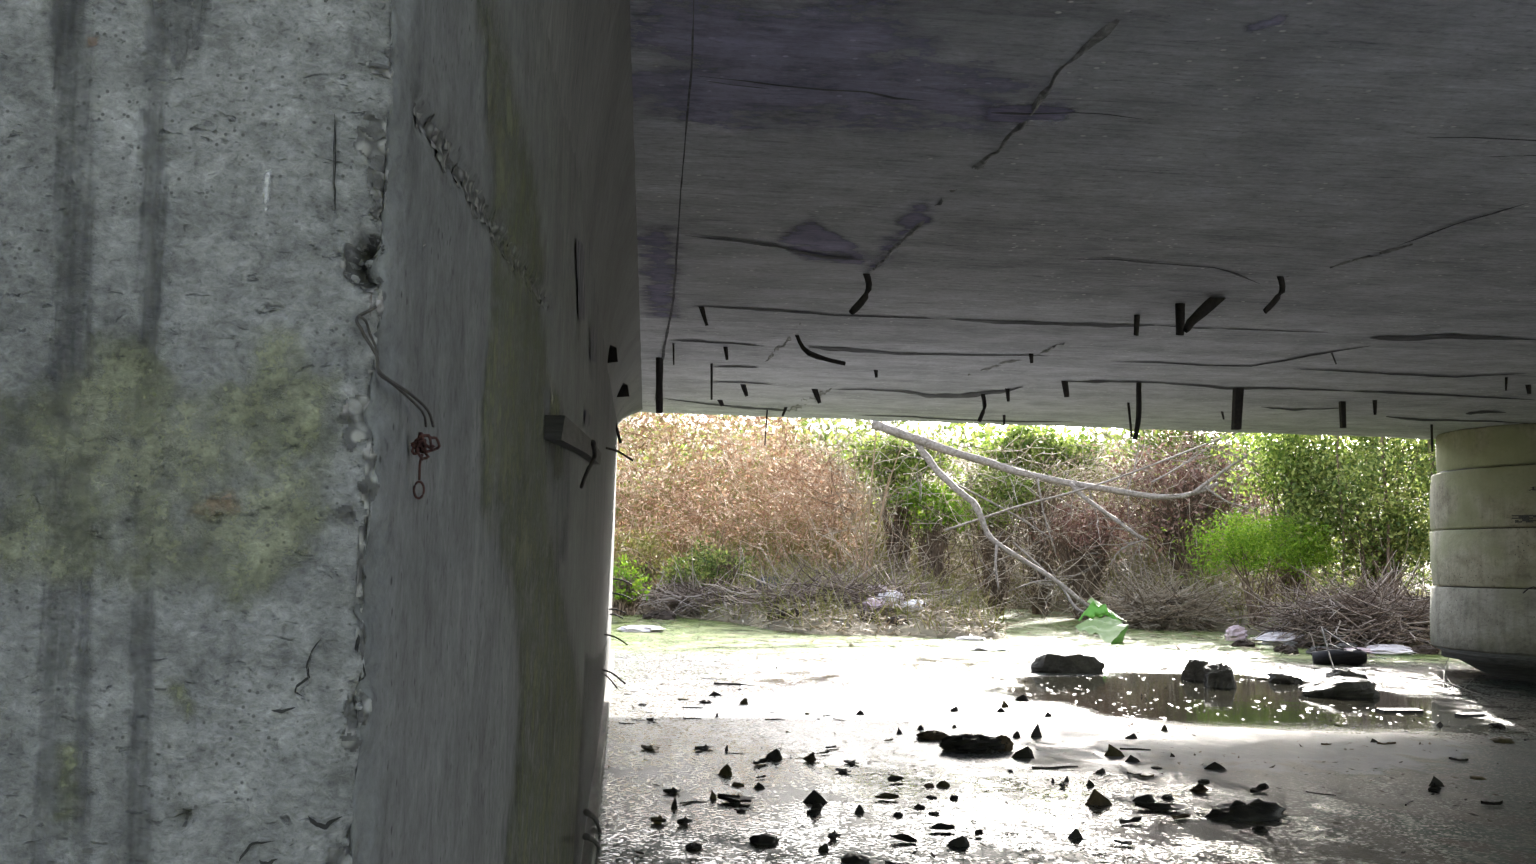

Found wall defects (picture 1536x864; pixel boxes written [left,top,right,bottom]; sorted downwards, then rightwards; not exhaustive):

leakage [149,0,208,69]
leakage [632,0,1073,130]
spalling [413,103,549,311]
leakage [780,205,931,267]
crack [655,0,1536,424]
leakage [50,208,93,678]